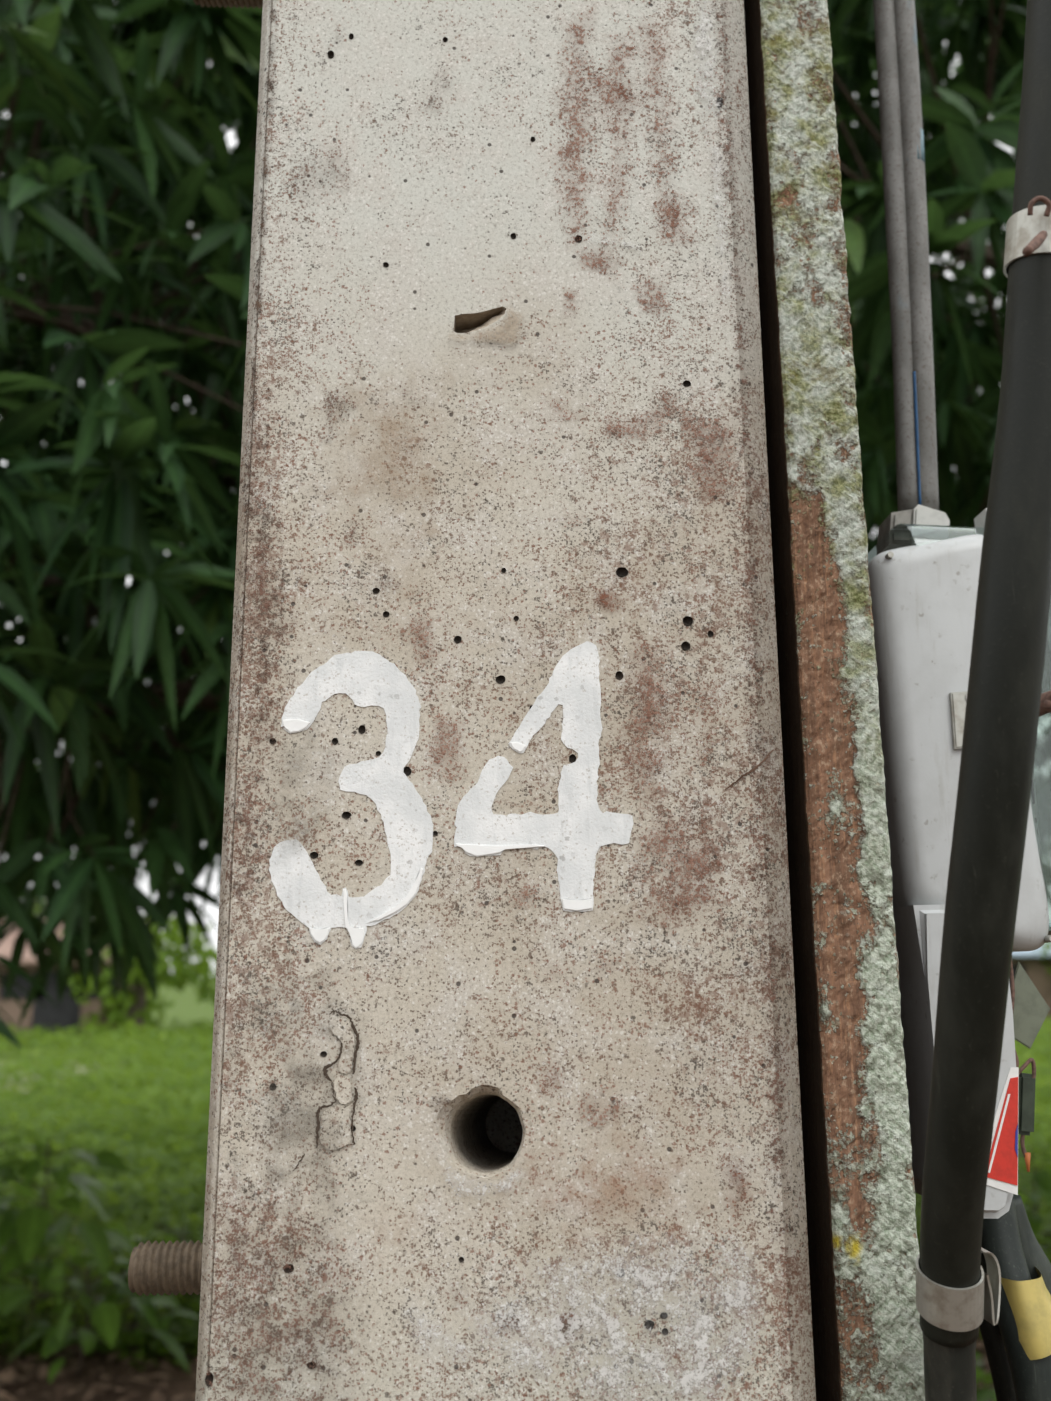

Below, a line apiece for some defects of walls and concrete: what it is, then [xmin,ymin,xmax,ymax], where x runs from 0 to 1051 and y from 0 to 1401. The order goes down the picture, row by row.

crack [293,1010,360,1171]
rust [543,1,796,1401]